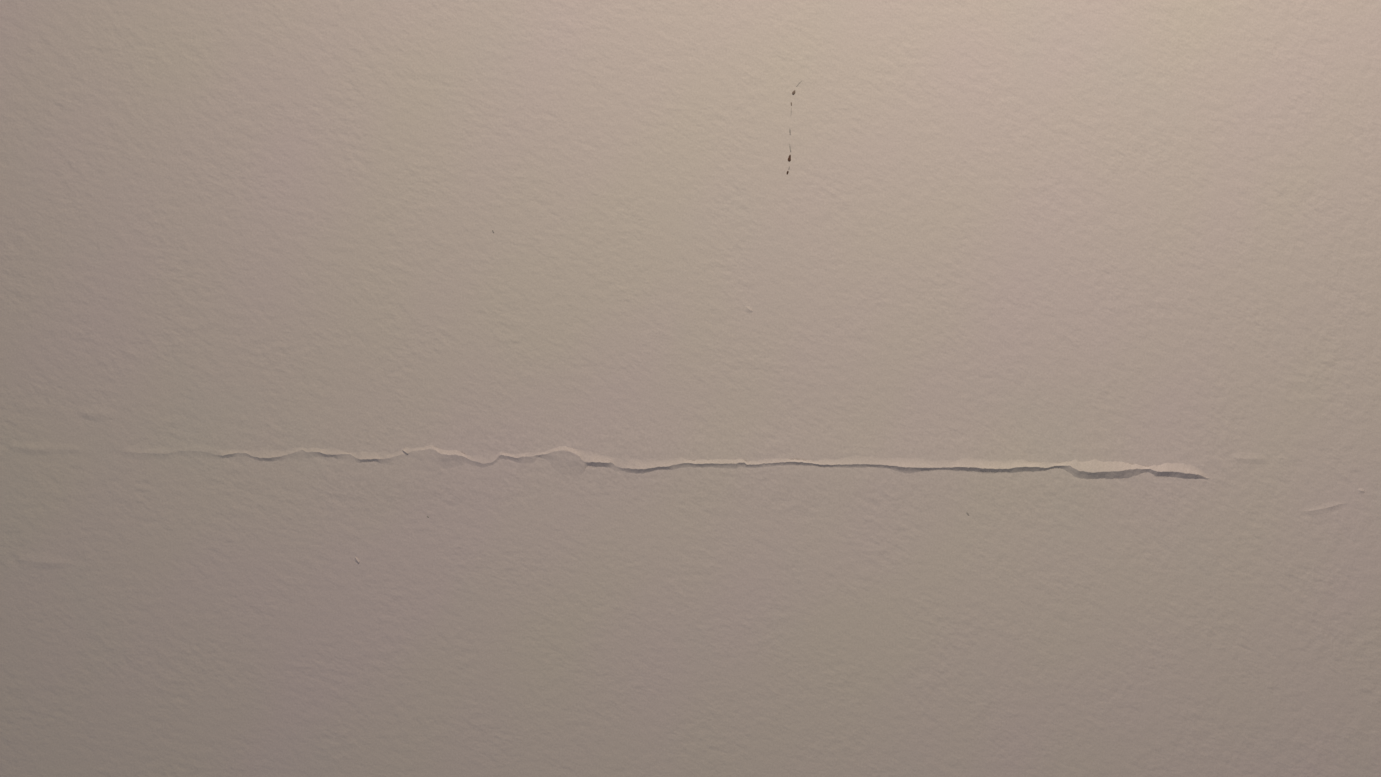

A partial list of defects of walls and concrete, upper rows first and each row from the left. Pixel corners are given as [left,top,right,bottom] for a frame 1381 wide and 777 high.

crack [118,439,1269,480]